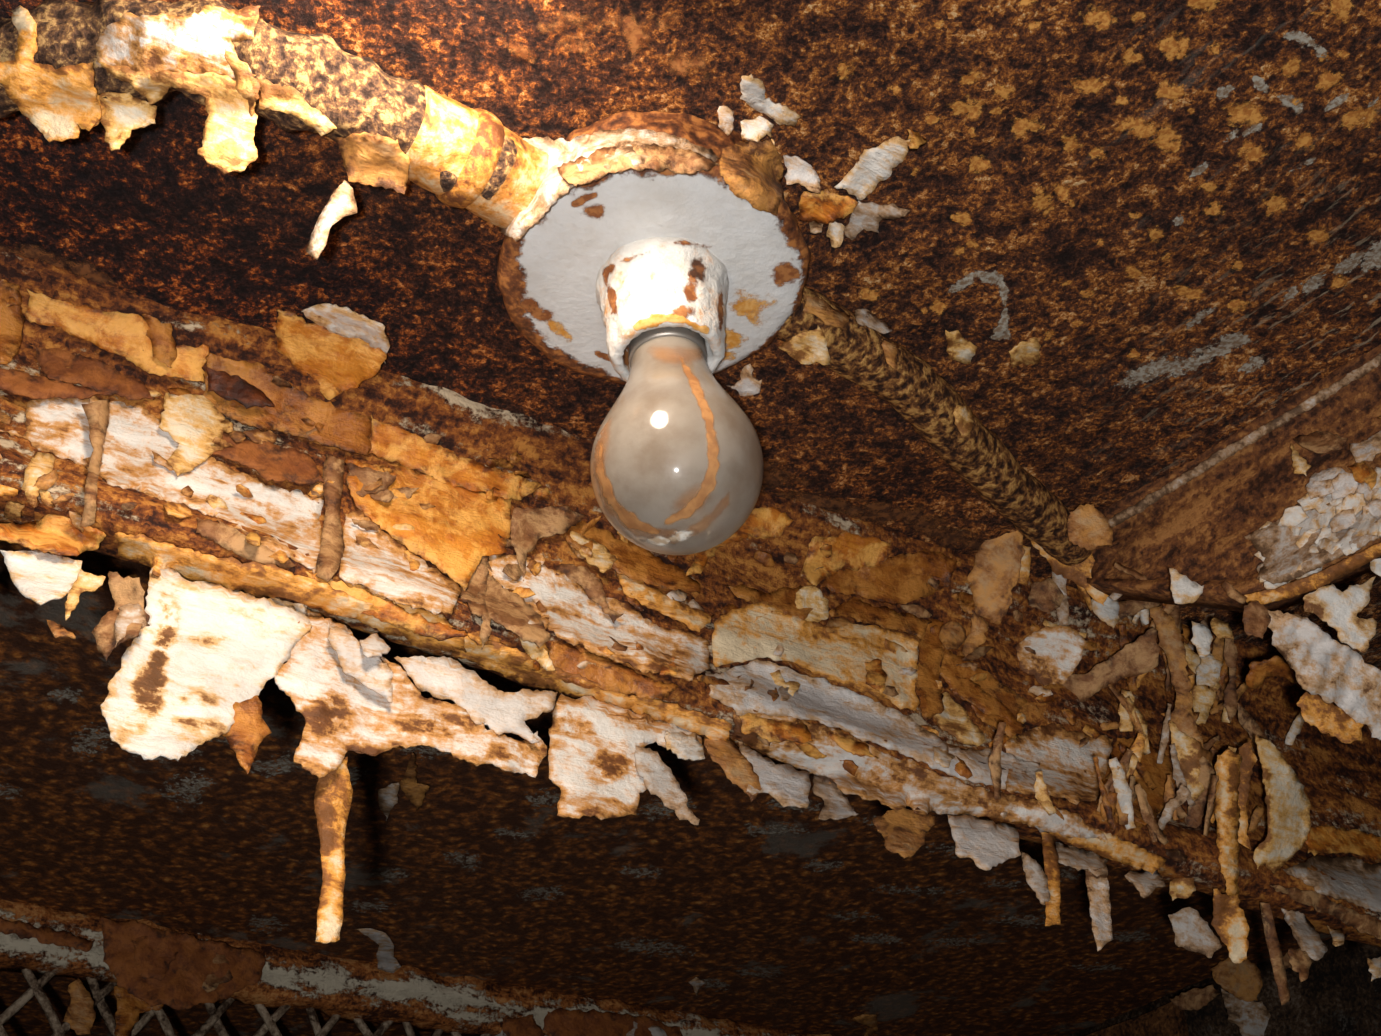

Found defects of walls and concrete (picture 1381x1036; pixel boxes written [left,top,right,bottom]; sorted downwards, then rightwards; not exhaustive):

corrosion [539,13,683,57]
corrosion [1079,7,1146,31]
corrosion [1158,31,1190,62]
peeling [0,5,410,195]
peeling [499,74,927,248]
corrosion [925,71,1045,140]
corrosion [1071,78,1181,154]
corrosion [1223,101,1267,162]
corrosion [571,193,604,218]
corrosion [951,212,979,255]
corrosion [520,298,572,341]
peeling [0,278,1381,1036]